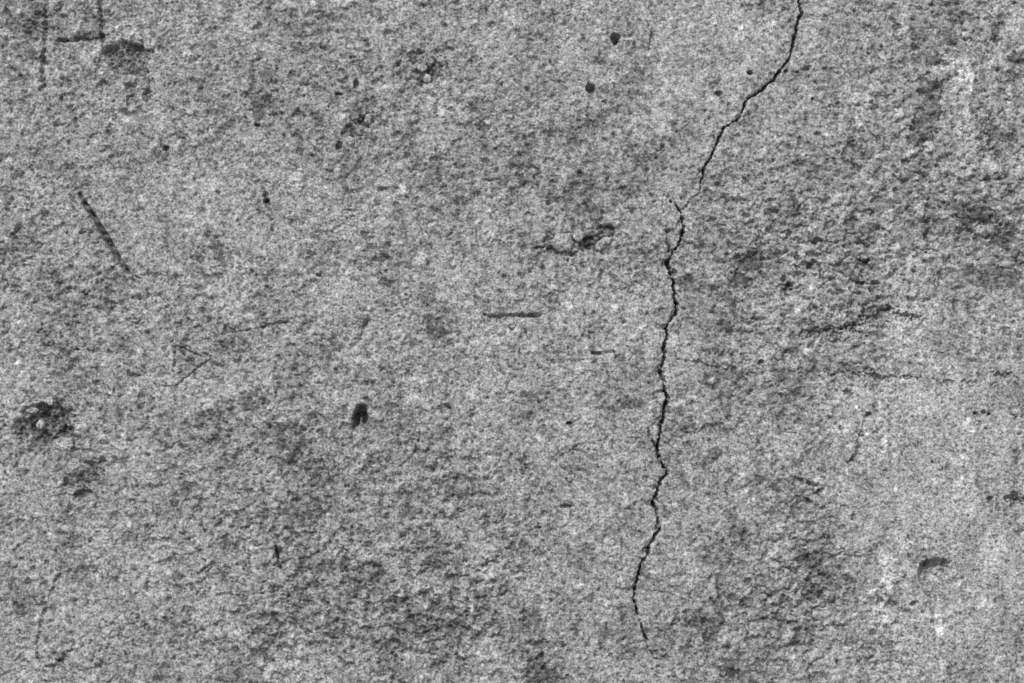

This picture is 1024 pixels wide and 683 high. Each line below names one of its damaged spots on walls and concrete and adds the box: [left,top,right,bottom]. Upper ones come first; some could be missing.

crack [632,0,804,661]